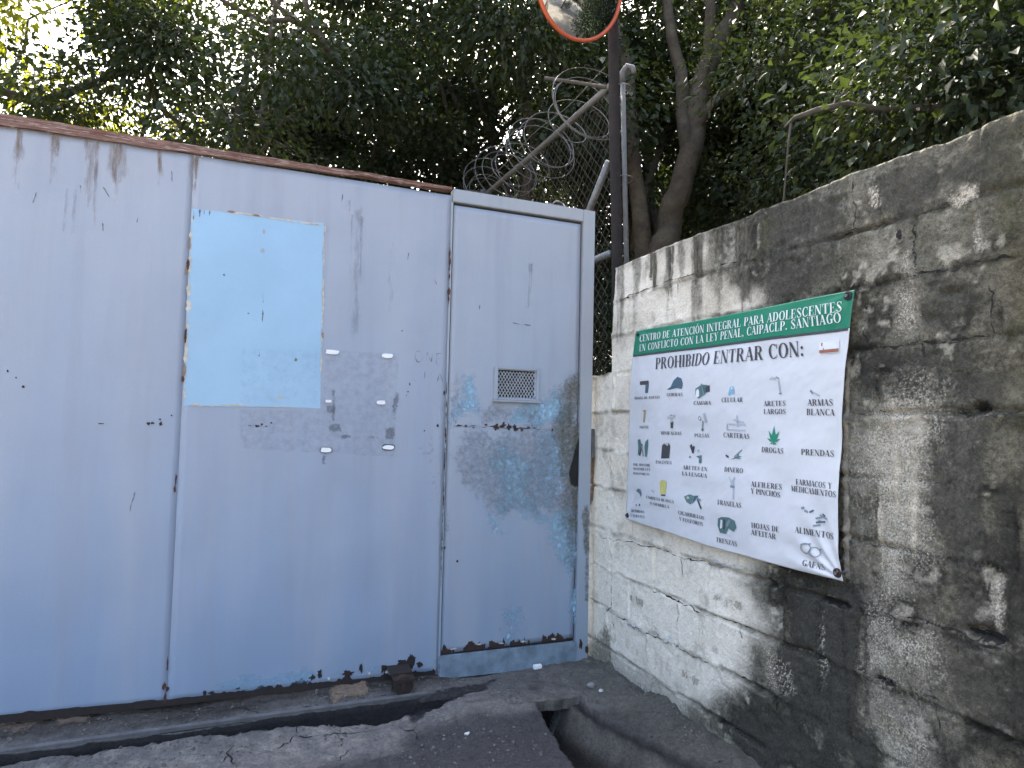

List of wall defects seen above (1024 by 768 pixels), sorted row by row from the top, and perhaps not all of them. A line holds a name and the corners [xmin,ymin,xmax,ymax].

damp [649,246,674,291]
damp [693,182,848,310]
corrosion [424,386,554,471]
peeling [511,392,568,505]
damp [725,250,1024,768]
corrosion [440,633,573,656]
corrosion [0,654,436,724]